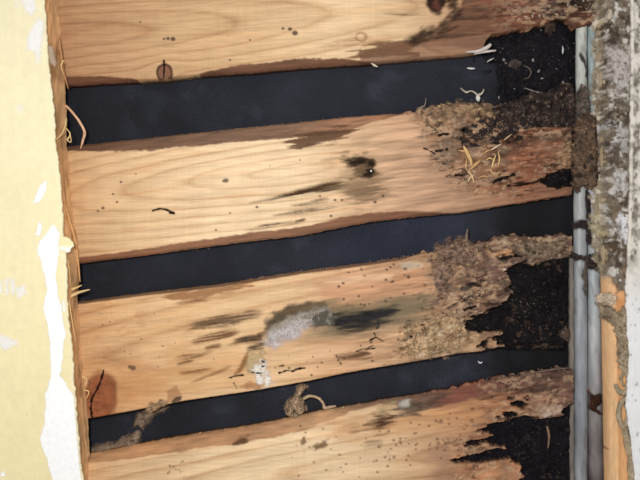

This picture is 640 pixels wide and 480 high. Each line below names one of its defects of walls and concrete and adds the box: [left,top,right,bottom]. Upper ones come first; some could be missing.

spalling [460,107,523,150]
damp [270,182,338,200]
damp [346,157,377,178]
spalling [539,169,572,189]
spalling [465,257,568,350]
peeling [36,222,81,480]
damp [192,298,428,388]
crack [90,370,104,417]
rust [587,390,602,415]
spalling [451,397,571,480]